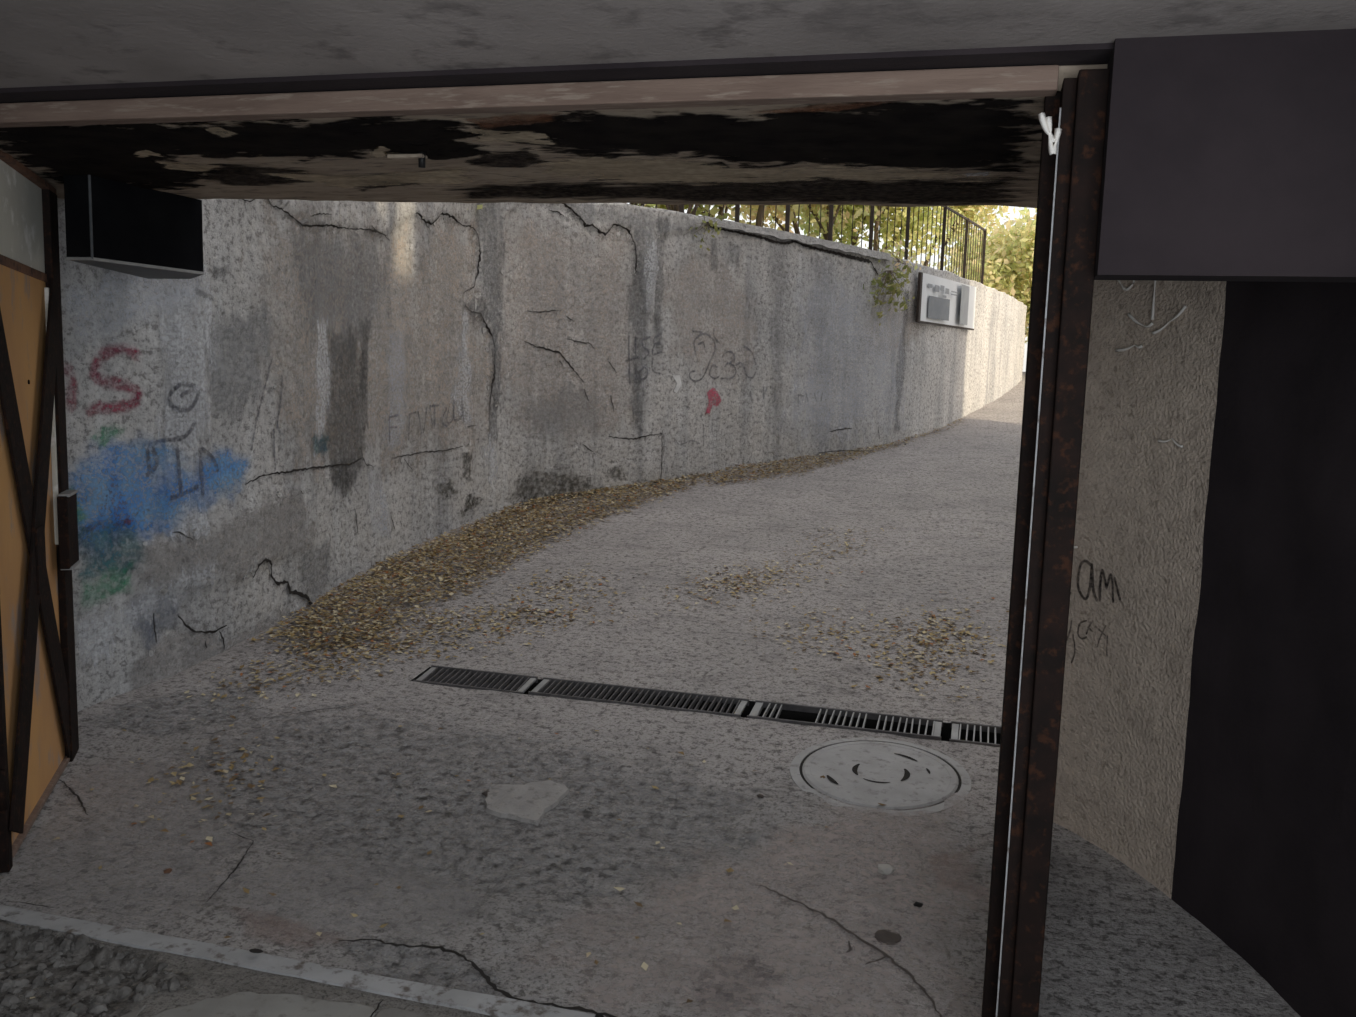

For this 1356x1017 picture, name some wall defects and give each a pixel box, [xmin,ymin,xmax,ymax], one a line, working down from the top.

peeling [206,127,236,137]
peeling [471,129,554,145]
peeling [135,150,219,171]
peeling [259,167,472,188]
peeling [540,157,987,186]
crack [242,199,663,485]
damp [300,239,375,492]
crack [253,558,313,605]
spalling [0,913,193,1017]